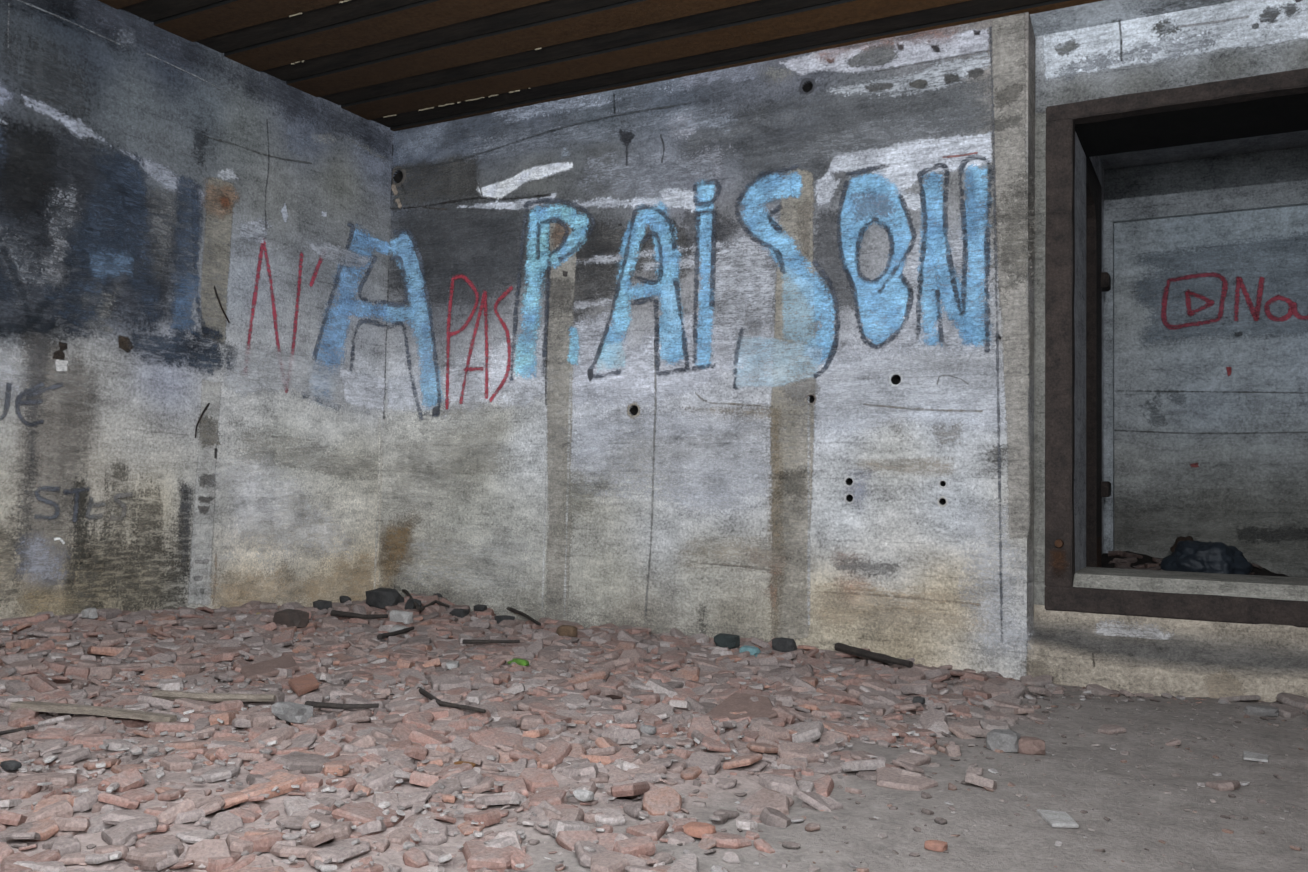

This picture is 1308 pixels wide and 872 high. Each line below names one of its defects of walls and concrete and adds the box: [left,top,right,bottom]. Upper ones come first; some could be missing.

water stain [0,335,192,615]
water stain [211,554,745,636]